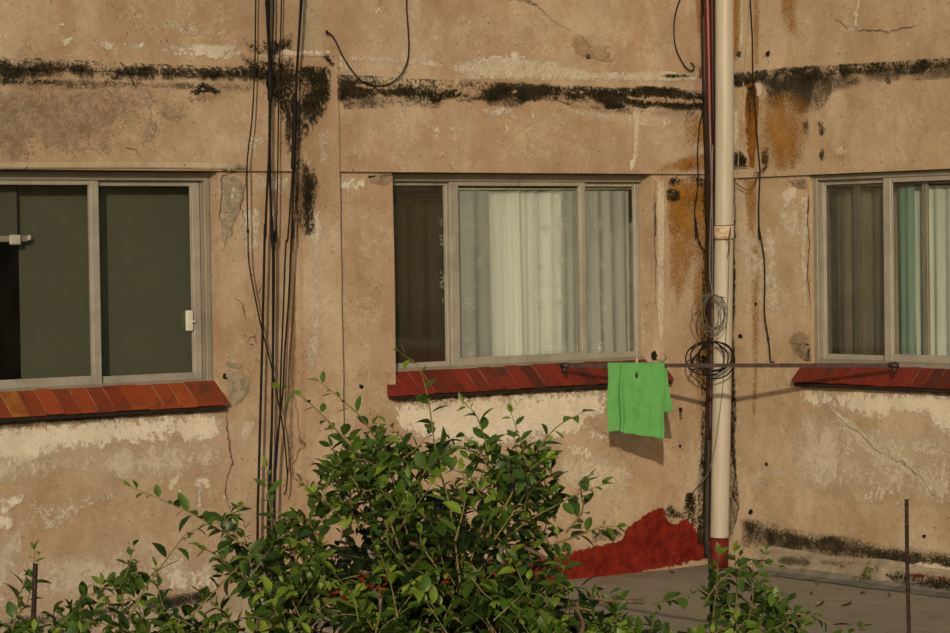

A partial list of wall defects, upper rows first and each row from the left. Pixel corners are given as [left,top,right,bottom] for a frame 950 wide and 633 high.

water stain [0,33,705,235]
water stain [734,151,747,168]
water stain [734,58,950,136]
rust [668,116,707,403]
peeling [739,179,808,315]
peeling [0,412,222,507]
crack [225,417,234,506]
peeling [395,389,630,495]
water stain [666,239,707,544]
water stain [729,180,950,590]
peeling [752,389,950,633]
crack [825,405,947,504]